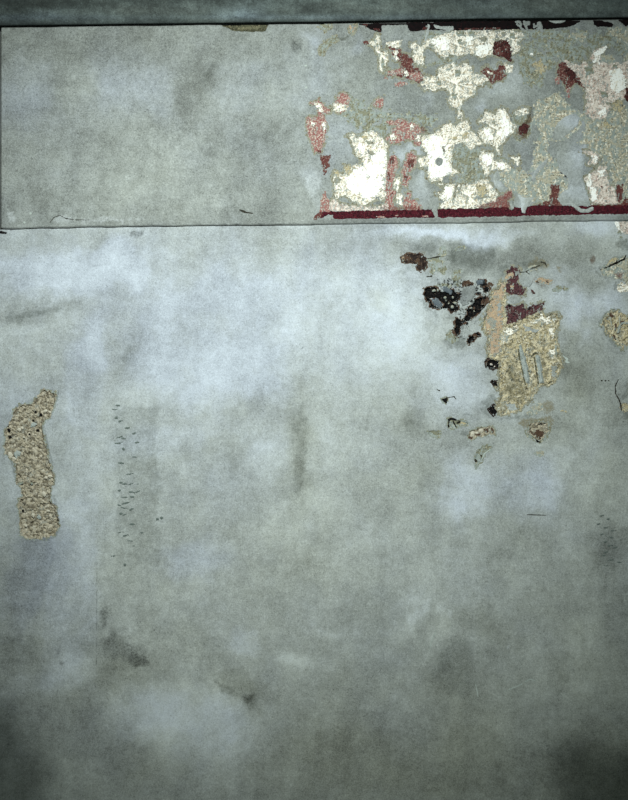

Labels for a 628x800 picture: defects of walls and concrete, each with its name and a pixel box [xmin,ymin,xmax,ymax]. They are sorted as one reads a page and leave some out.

flaking render [316,24,340,57]
flaking render [363,20,564,218]
flaking render [551,44,628,141]
flaking render [319,130,404,212]
flaking render [557,148,619,213]
spalling [422,245,570,470]
spalling [598,308,628,352]
spalling [2,388,61,541]